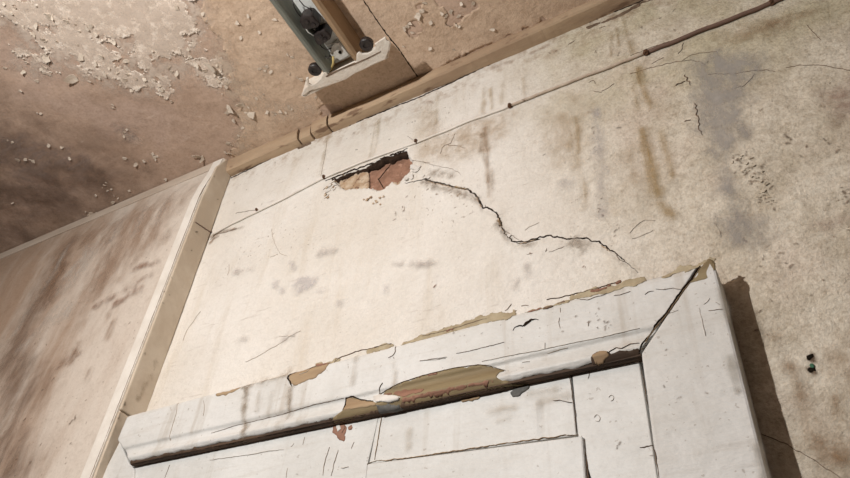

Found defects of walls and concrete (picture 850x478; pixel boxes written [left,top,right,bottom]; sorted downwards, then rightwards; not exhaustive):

spalling [586,3,640,29]
peeling [0,0,590,158]
flaking render [323,148,421,205]
crack [406,134,638,273]
peeling [661,257,716,283]
peeling [280,277,646,386]
peeling [332,364,529,441]